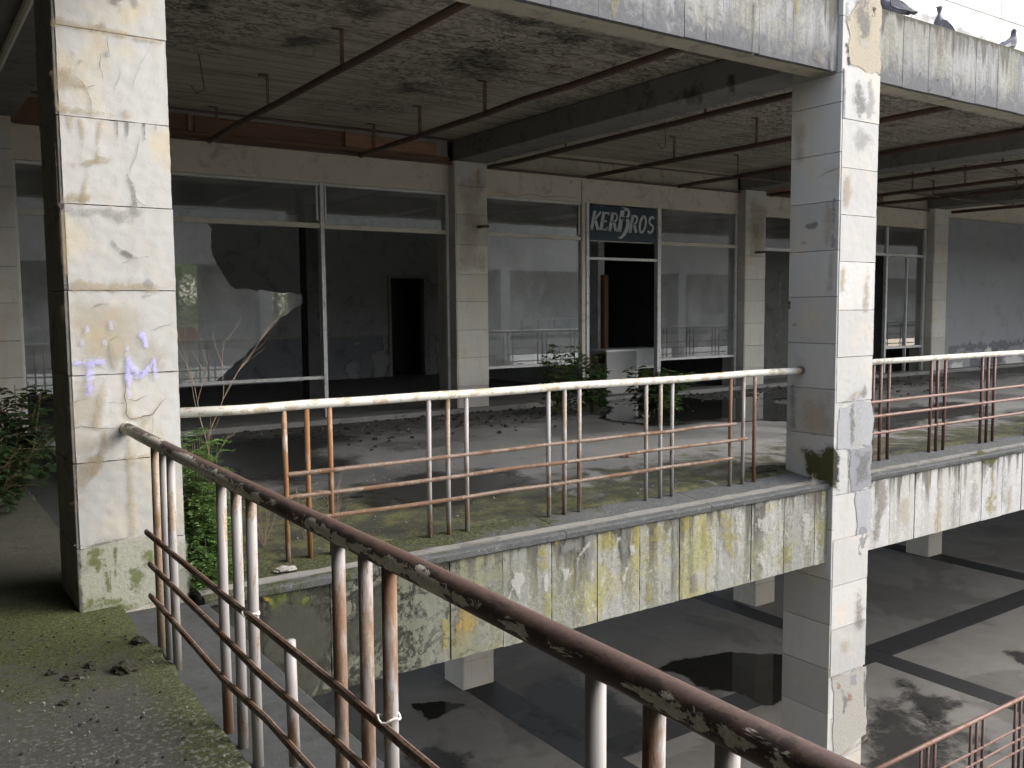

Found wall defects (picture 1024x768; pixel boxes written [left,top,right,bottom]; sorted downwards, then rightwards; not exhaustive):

crack [72,38,149,108]
spalling [846,0,882,74]
crack [128,136,143,207]
crack [72,336,165,447]
peeling [838,401,874,554]
leakage [874,471,887,539]
flaking render [74,537,156,612]
flaking render [177,542,190,603]
leakage [259,590,333,698]
leakage [347,609,359,661]
leakage [373,589,382,647]
peeling [832,666,867,755]